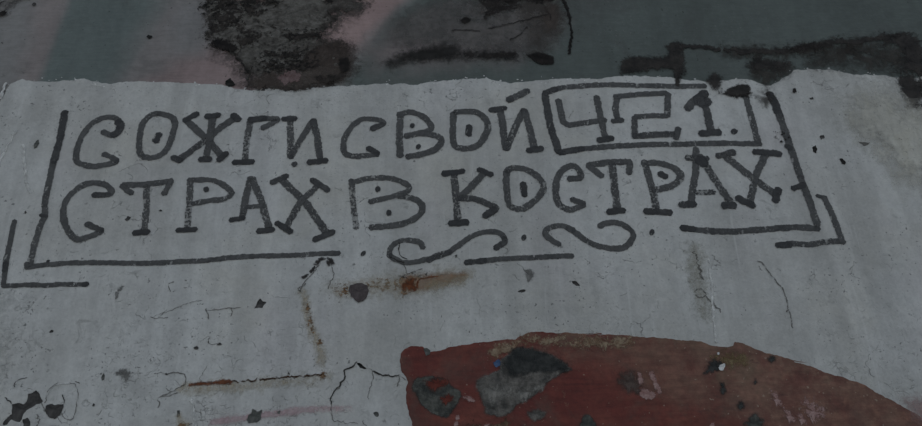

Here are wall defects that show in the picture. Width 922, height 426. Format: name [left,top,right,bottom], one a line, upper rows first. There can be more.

rust [299,283,324,359]
rust [366,272,466,295]
crack [758,261,793,328]
spalling [3,381,79,426]
rust [188,372,327,391]
crack [330,362,406,426]
spalling [412,330,635,426]